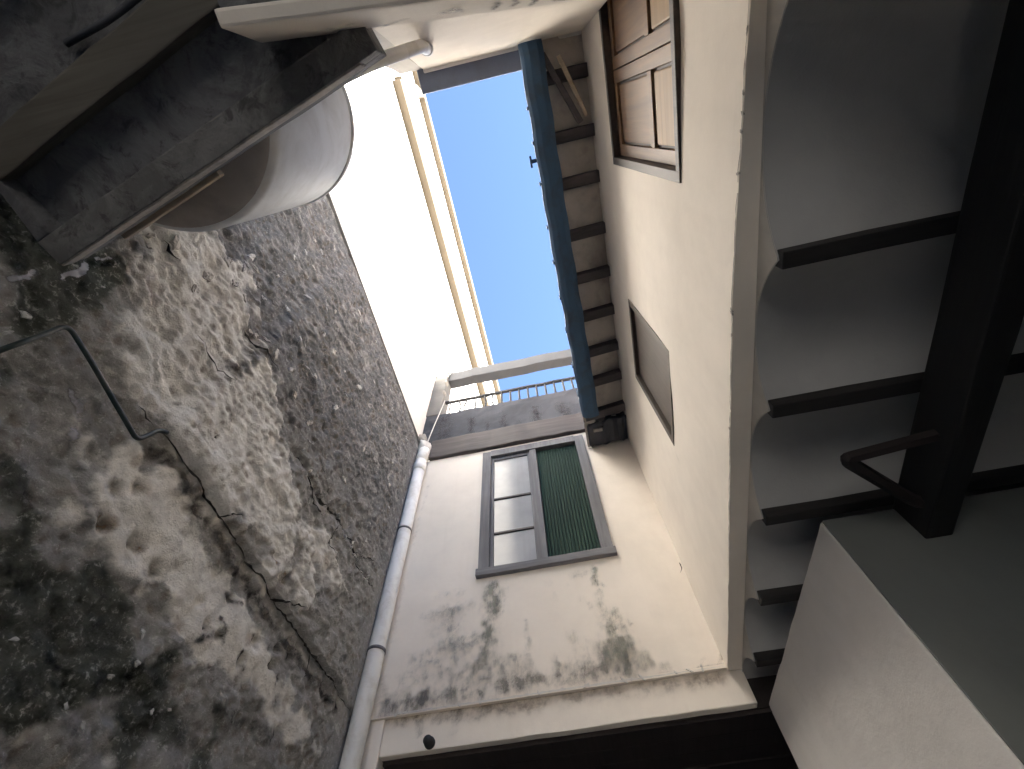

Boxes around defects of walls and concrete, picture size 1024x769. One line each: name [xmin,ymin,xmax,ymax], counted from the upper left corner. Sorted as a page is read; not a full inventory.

damp [149,446,274,628]
crack [139,406,352,713]
crack [292,448,374,586]
damp [283,640,338,711]
damp [386,687,465,719]
damp [473,582,561,711]
damp [574,612,640,684]